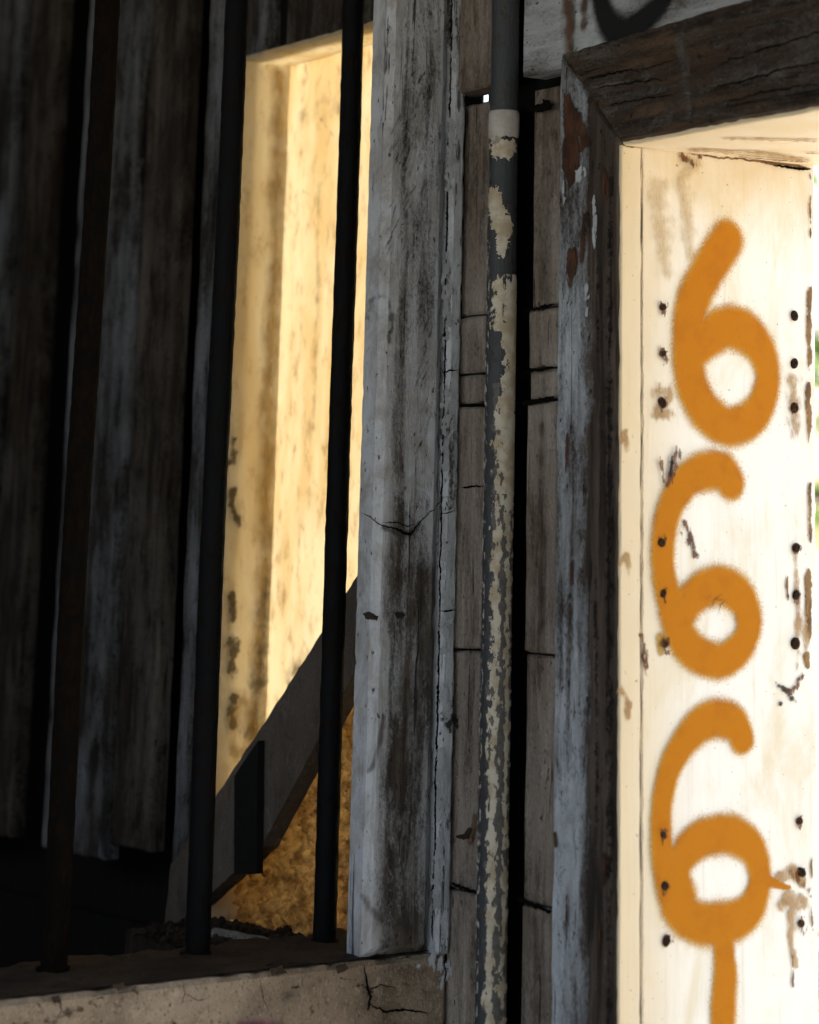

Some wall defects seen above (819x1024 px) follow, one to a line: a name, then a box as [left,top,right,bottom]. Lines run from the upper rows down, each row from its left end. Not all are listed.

peeling [489,135,517,161]
crack [362,0,482,941]
peeling [474,185,517,1024]
crack [515,897,552,914]
crack [364,966,428,1014]